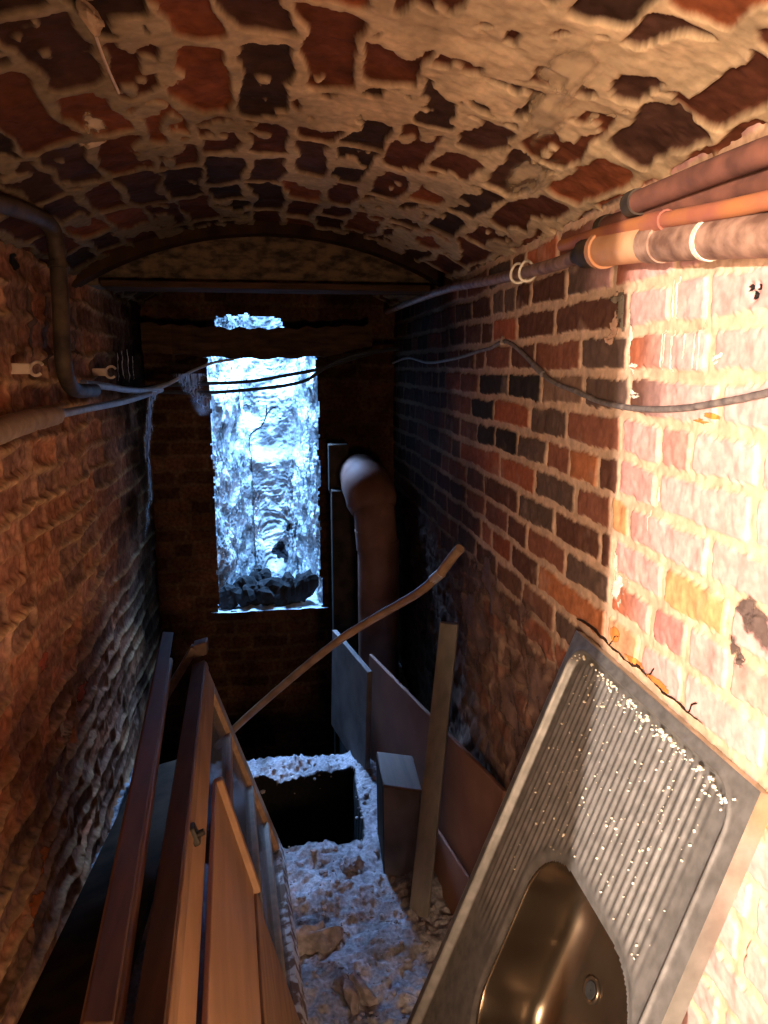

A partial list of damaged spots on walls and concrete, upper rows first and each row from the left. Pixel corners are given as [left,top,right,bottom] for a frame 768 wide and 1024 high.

peeling [79,116,107,150]
peeling [529,52,597,137]
peeling [509,161,553,193]
crack [576,618,702,724]